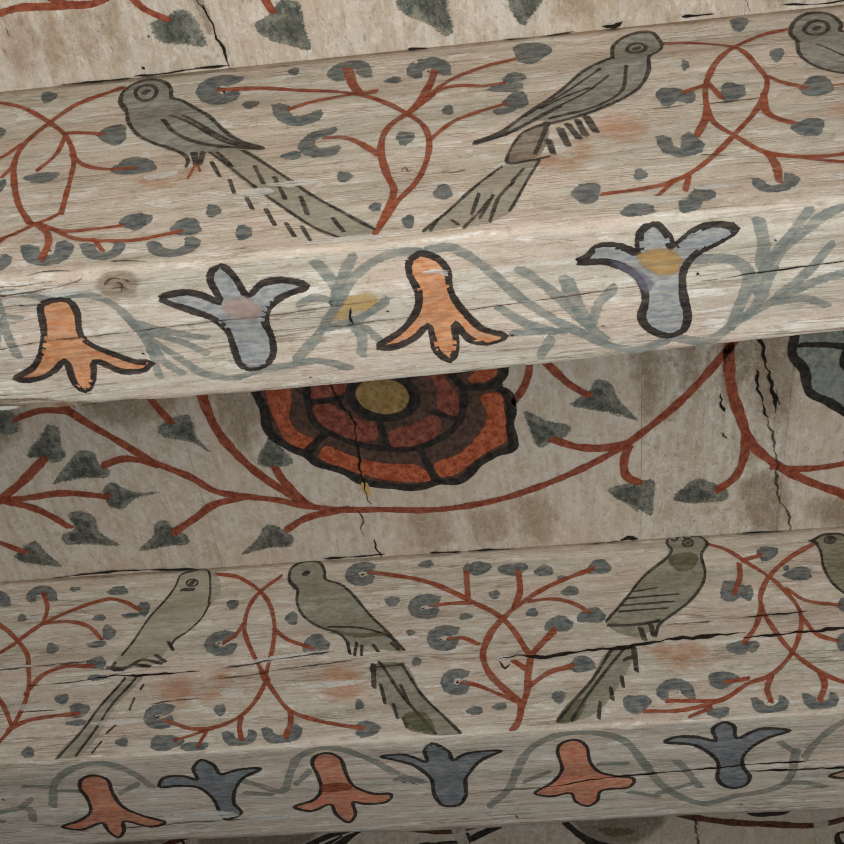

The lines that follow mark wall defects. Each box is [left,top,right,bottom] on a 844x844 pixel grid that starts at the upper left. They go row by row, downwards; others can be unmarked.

crack [783,0,844,8]
crack [682,11,713,19]
crack [602,21,622,29]
crack [503,31,575,40]
crack [62,0,230,85]
crack [742,339,792,534]
crack [325,384,385,560]
crack [592,536,638,544]
crack [430,547,505,555]
crack [54,568,195,578]
crack [496,611,844,669]
crack [127,819,241,844]